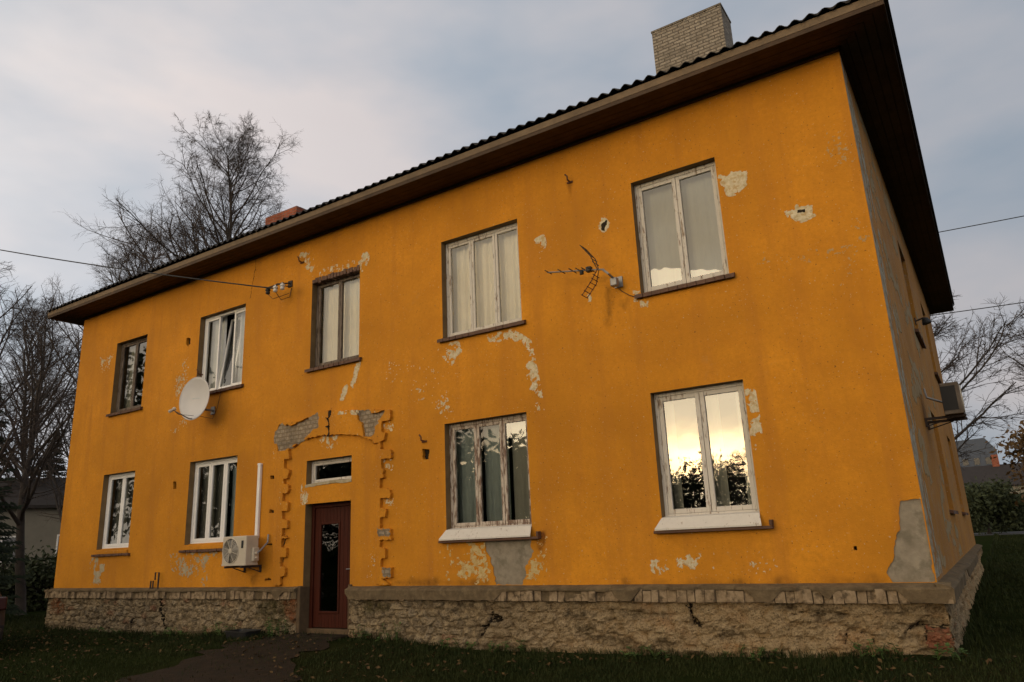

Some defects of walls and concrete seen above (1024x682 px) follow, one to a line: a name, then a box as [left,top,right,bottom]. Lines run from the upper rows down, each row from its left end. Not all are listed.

peeling [718,170,747,197]
peeling [299,252,370,276]
flaking render [757,57,963,582]
peeling [487,329,543,411]
flaking render [273,412,339,454]
crack [323,410,331,436]
flaking render [338,360,394,437]
peeling [745,389,763,450]
flaking render [439,536,547,585]
peeling [650,553,701,575]
crack [158,598,167,632]
crack [480,608,501,636]